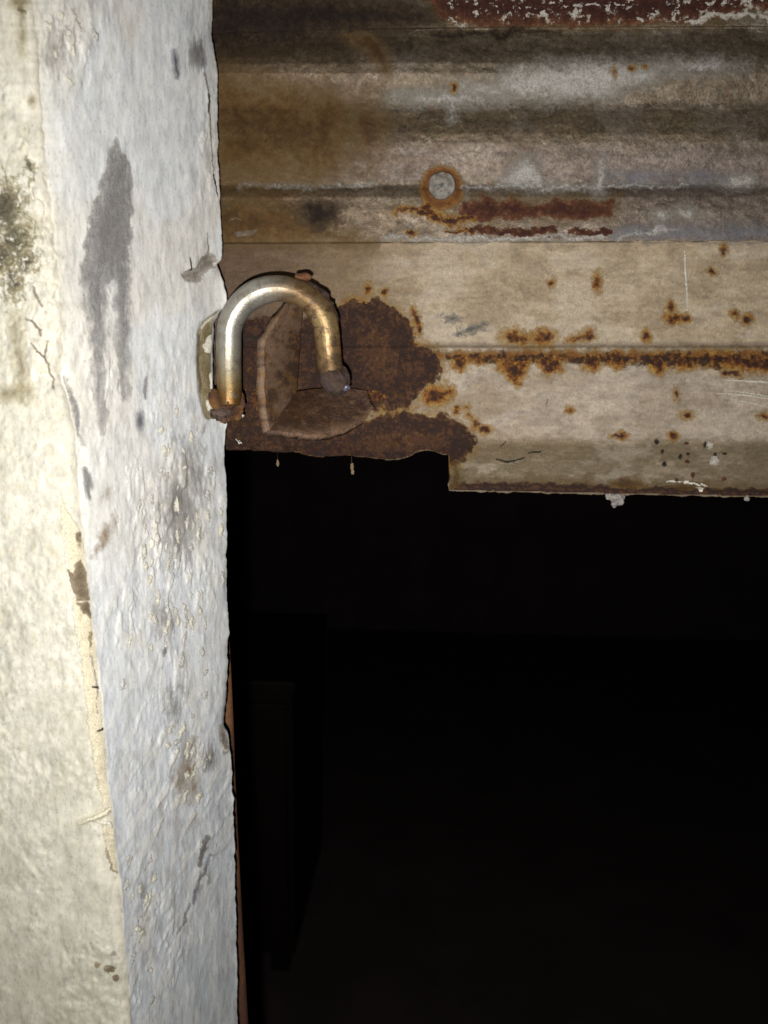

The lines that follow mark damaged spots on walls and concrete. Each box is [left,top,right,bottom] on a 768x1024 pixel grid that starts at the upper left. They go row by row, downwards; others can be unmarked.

rust [430,0,768,30]
damp [0,155,42,308]
damp [81,139,134,428]
rust [391,165,616,239]
rust [208,283,768,496]